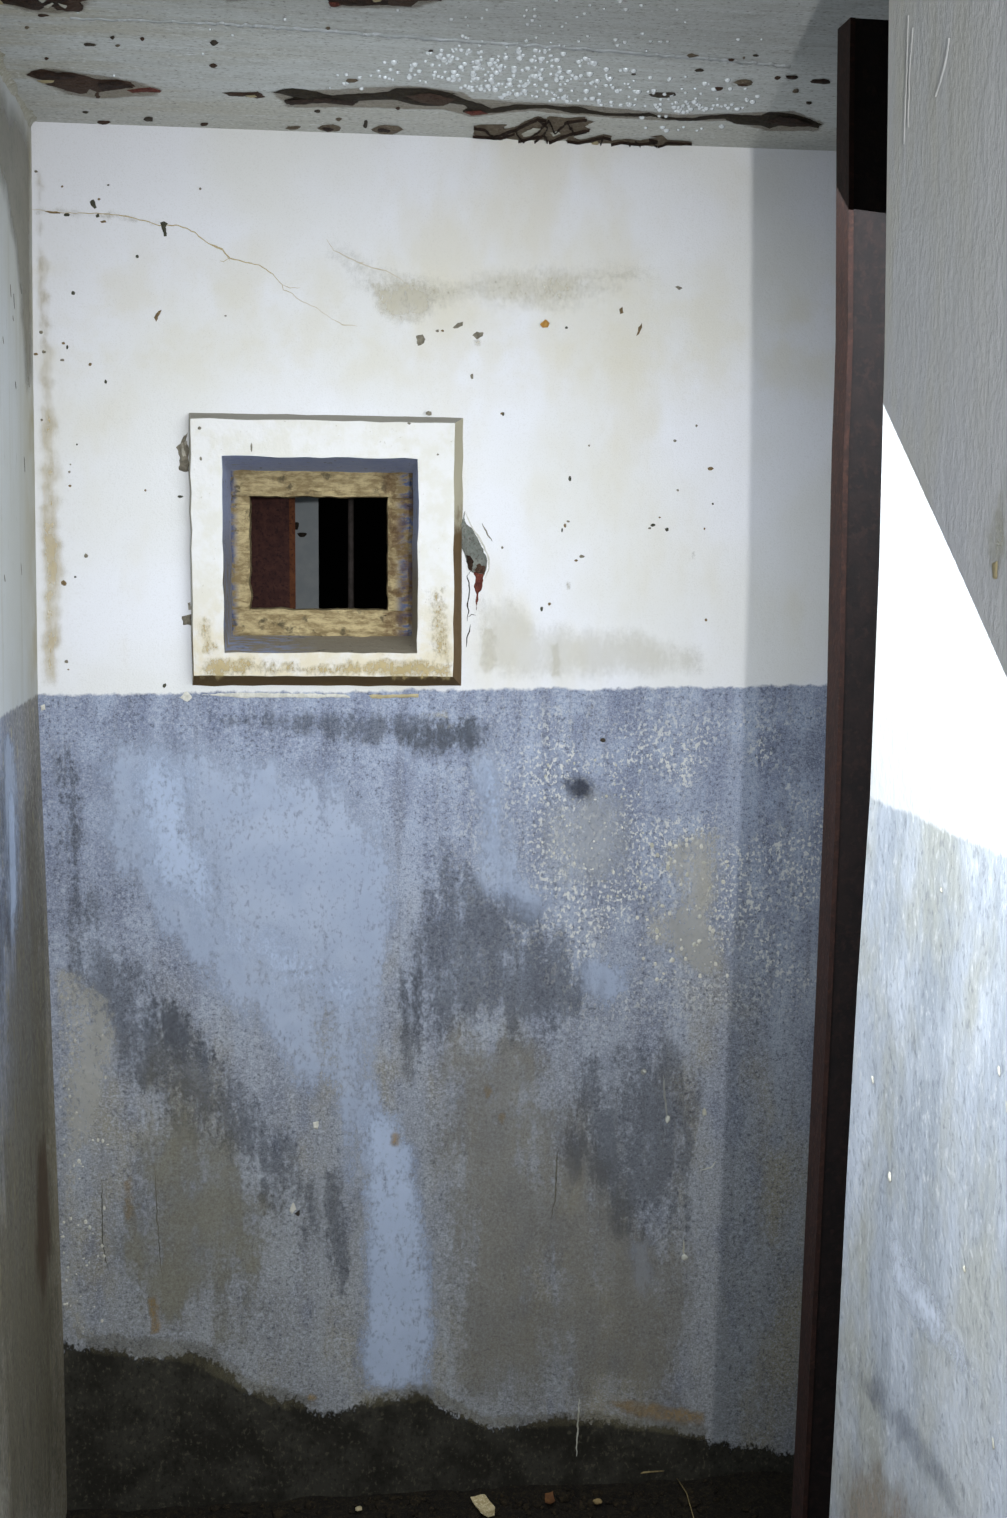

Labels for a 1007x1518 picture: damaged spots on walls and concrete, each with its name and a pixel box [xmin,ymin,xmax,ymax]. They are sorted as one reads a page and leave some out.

spalling [0,0,86,29]
spalling [27,57,161,125]
crack [32,209,355,326]
damp [38,739,794,1512]